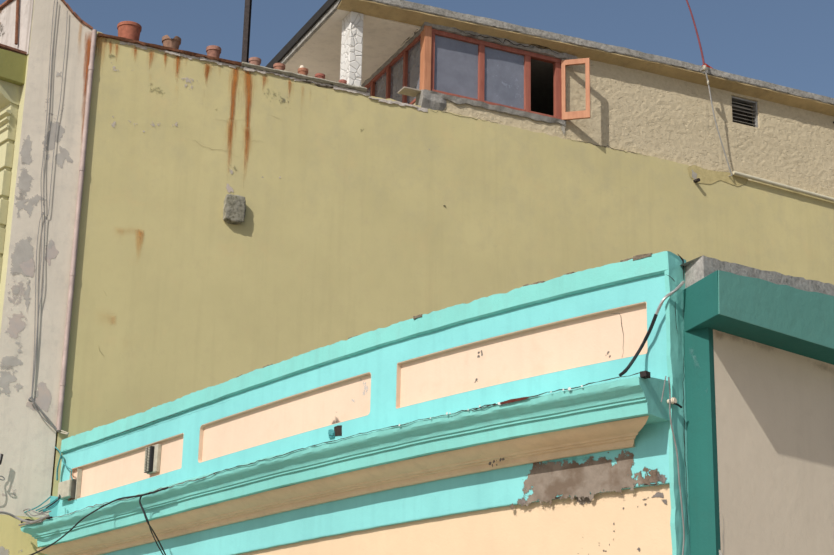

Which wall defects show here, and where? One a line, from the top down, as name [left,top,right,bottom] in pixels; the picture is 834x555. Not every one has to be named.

peeling [42,98,73,168]
rust [84,37,117,104]
rust [229,69,252,154]
peeling [15,135,46,218]
peeling [0,236,35,396]
peeling [510,450,667,510]